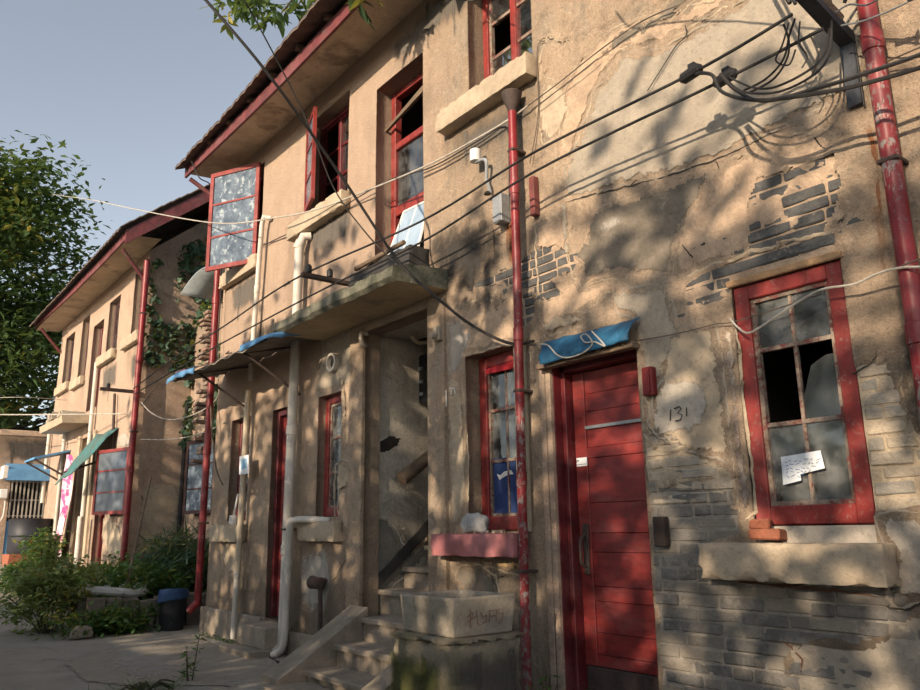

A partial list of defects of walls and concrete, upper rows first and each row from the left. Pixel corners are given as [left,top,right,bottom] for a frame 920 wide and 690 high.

flaking render [454,0,920,690]